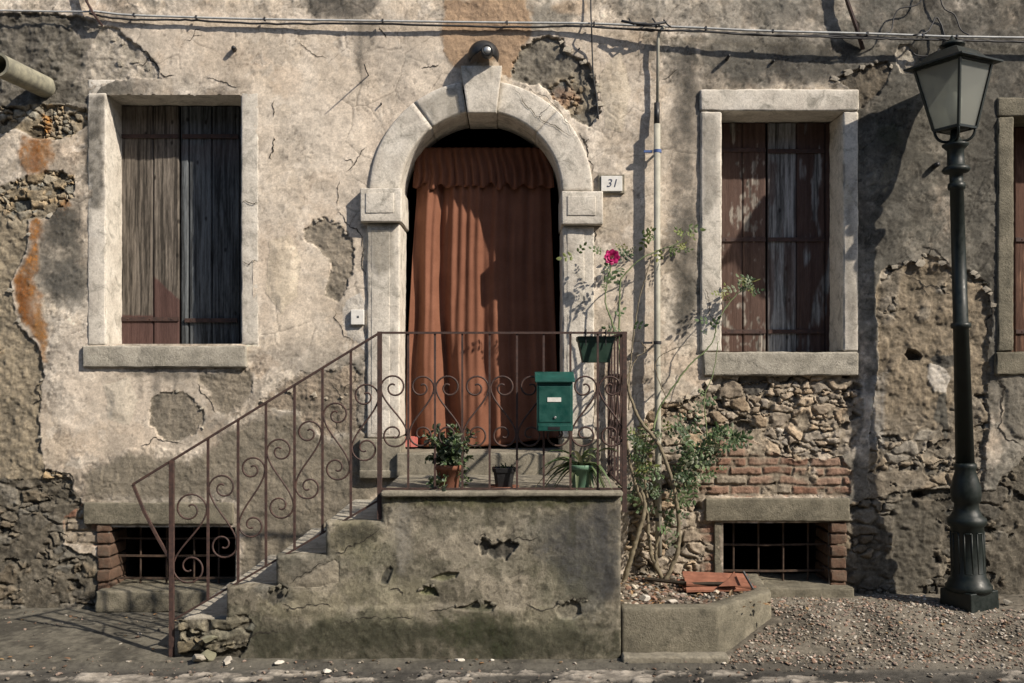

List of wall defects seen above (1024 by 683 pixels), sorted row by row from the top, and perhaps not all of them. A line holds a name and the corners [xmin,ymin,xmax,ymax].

spalling [511,35,605,127]
spalling [830,44,920,109]
crack [516,91,594,173]
spalling [303,217,355,302]
peeling [149,364,365,441]
spalling [867,253,955,499]
spalling [967,270,997,489]
flaking render [62,503,110,583]
spalling [418,572,458,595]
spalling [474,536,518,560]
crack [526,597,590,611]